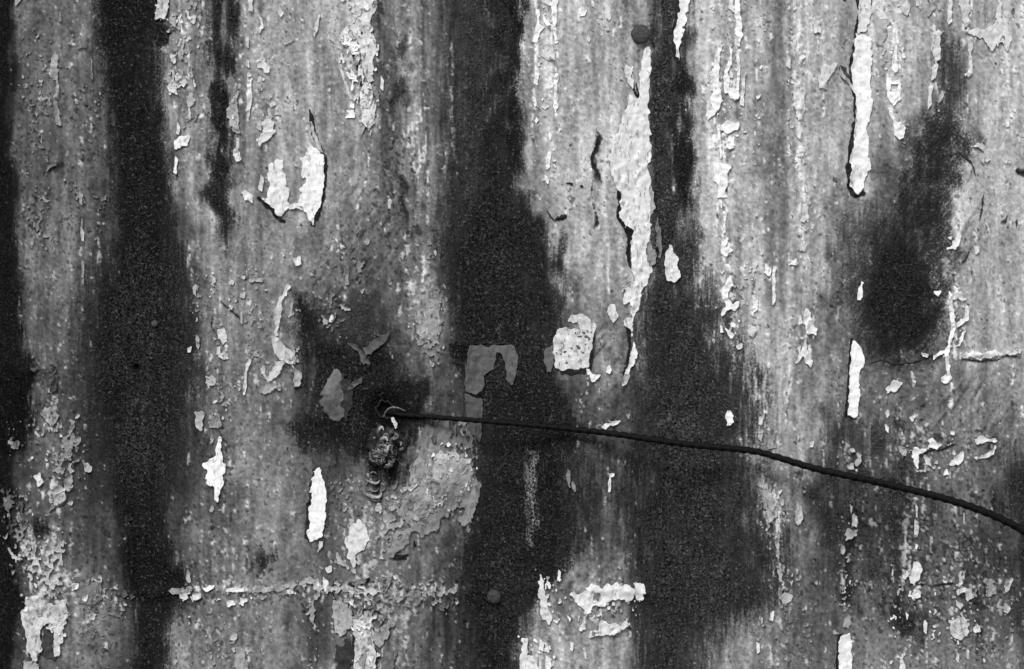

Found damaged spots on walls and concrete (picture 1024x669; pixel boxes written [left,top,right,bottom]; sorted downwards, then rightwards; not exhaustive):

damp [0,0,35,669]
peeling [0,355,135,669]
damp [72,0,202,669]
damp [200,0,241,257]
peeling [192,230,390,512]
peeling [168,464,458,669]
damp [289,289,437,500]
peeling [515,569,646,669]
peeling [542,46,681,386]
damp [436,0,790,669]
damp [827,37,985,371]
peeling [818,0,1012,198]